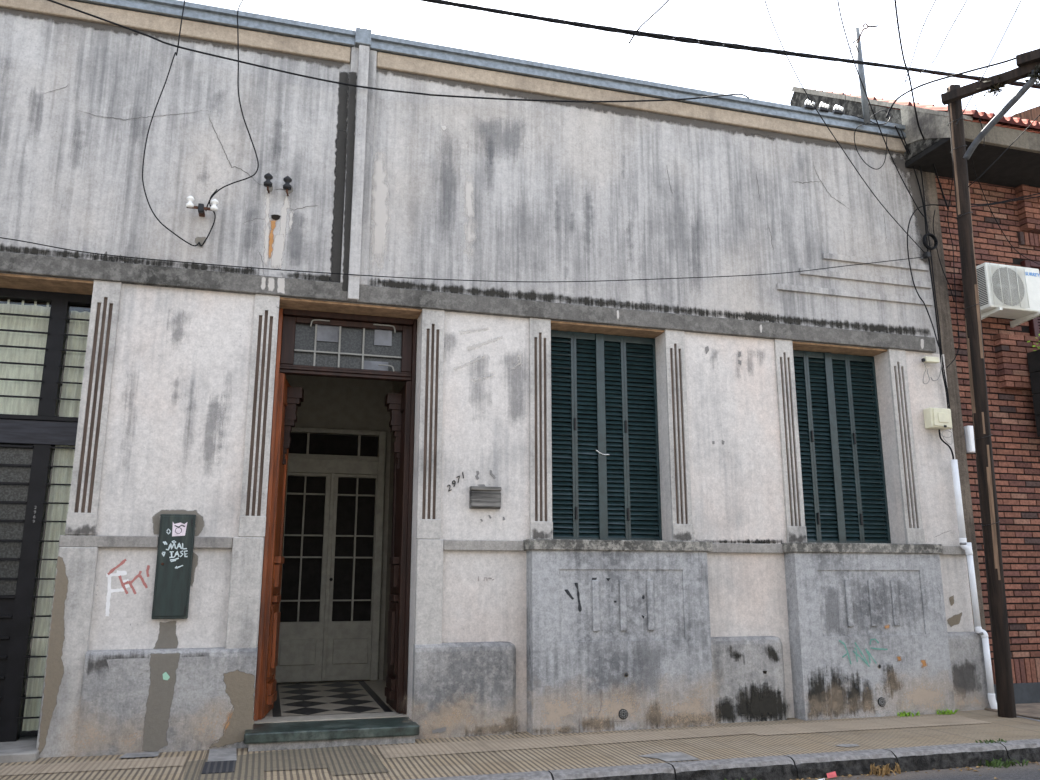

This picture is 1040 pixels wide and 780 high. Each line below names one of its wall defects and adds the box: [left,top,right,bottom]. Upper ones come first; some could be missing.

leakage [0,7,357,293]
leakage [377,68,932,263]
leakage [372,153,388,259]
spalling [210,670,255,748]
leakage [536,683,789,735]
leakage [808,668,875,717]
leakage [953,660,978,704]